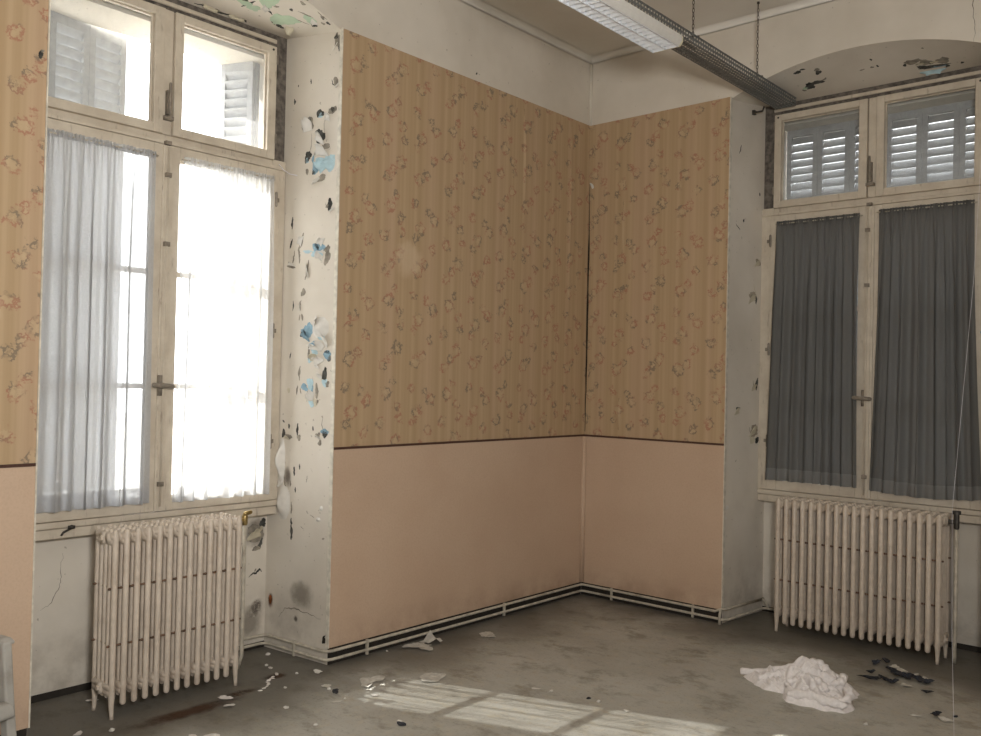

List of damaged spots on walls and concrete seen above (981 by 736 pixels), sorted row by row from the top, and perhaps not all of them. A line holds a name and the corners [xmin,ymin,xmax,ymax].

peeling [237,0,340,51]
peeling [903,48,964,76]
peeling [793,68,826,91]
peeling [301,106,337,184]
peeling [303,237,331,266]
peeling [287,316,331,408]
peeling [282,420,301,441]
peeling [312,417,329,446]